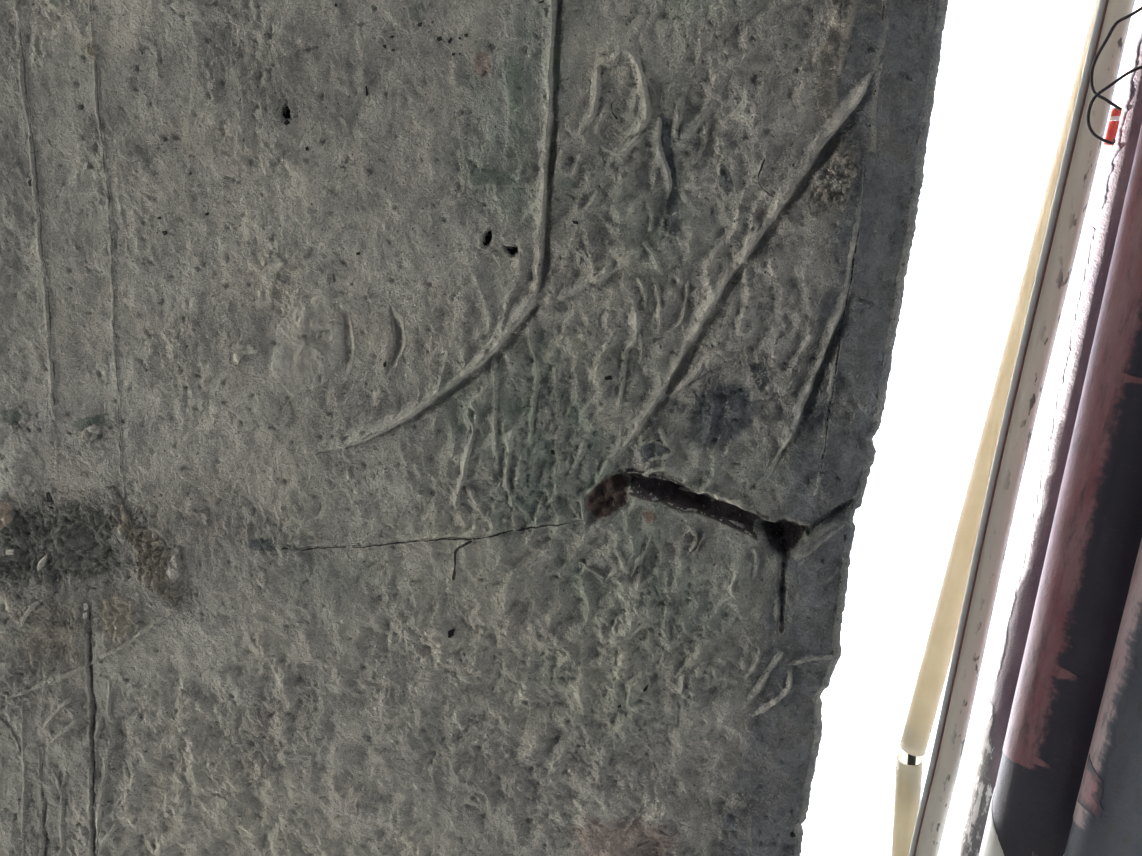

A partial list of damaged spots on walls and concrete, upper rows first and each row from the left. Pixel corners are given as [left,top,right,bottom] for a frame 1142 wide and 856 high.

crack [236,514,588,583]